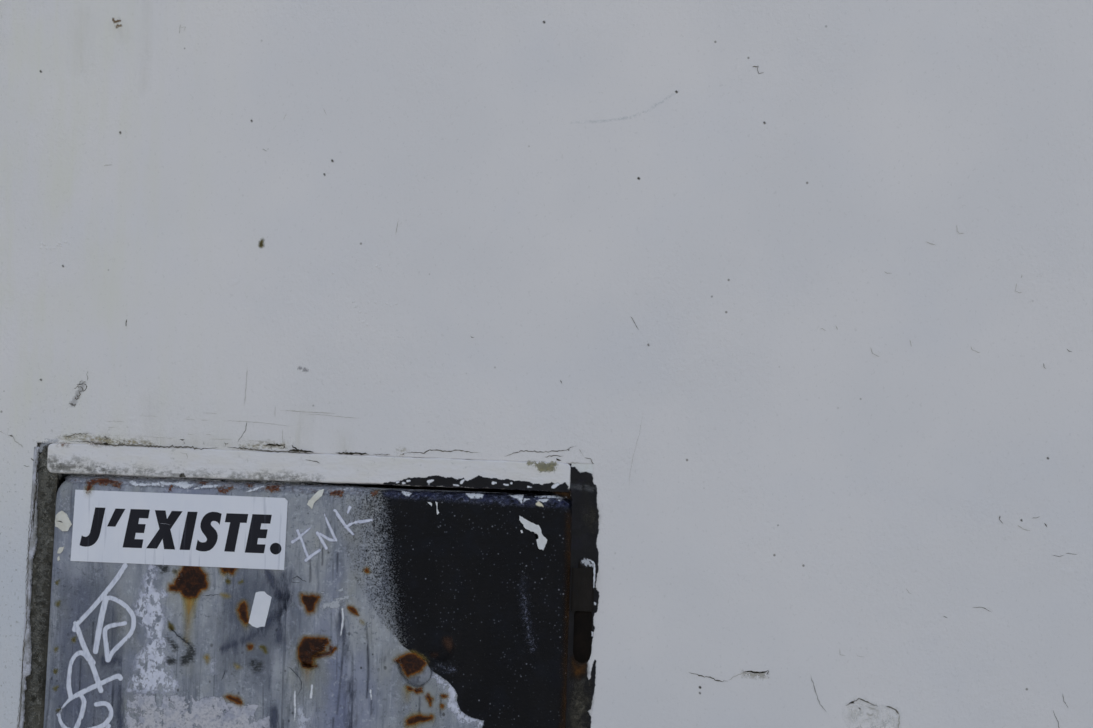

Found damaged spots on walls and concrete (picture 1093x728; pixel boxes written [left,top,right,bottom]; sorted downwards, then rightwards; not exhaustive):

crack [507,447,594,464]
crack [0,431,61,728]
rust [168,566,209,617]
rust [220,567,249,625]
rust [300,593,321,614]
rust [297,636,337,669]
rust [394,652,448,726]
crack [689,663,769,682]